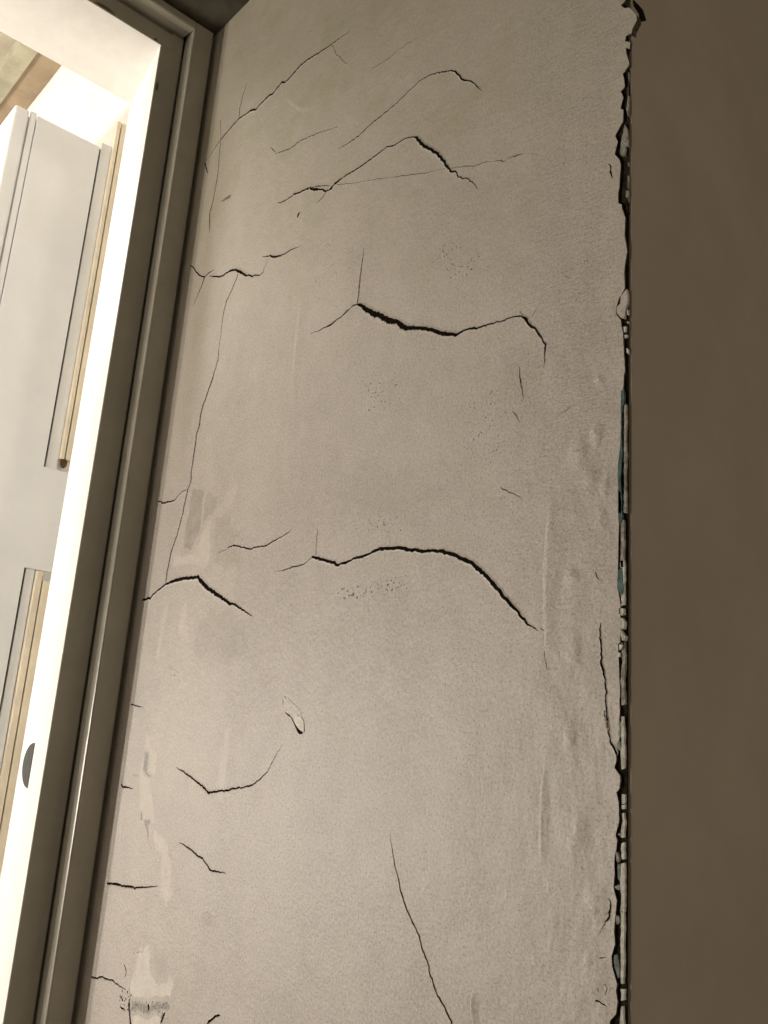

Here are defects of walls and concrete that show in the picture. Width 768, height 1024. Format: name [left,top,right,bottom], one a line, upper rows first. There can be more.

flaking render [622,0,646,22]
crack [271,69,537,204]
crack [310,251,547,422]
crack [142,247,298,617]
flaking render [611,36,630,1024]
crack [218,526,547,670]
crack [176,744,283,796]
flaking render [283,696,304,734]
crack [598,622,618,756]
crack [107,881,158,891]
crack [179,842,226,874]
crack [390,835,453,1024]